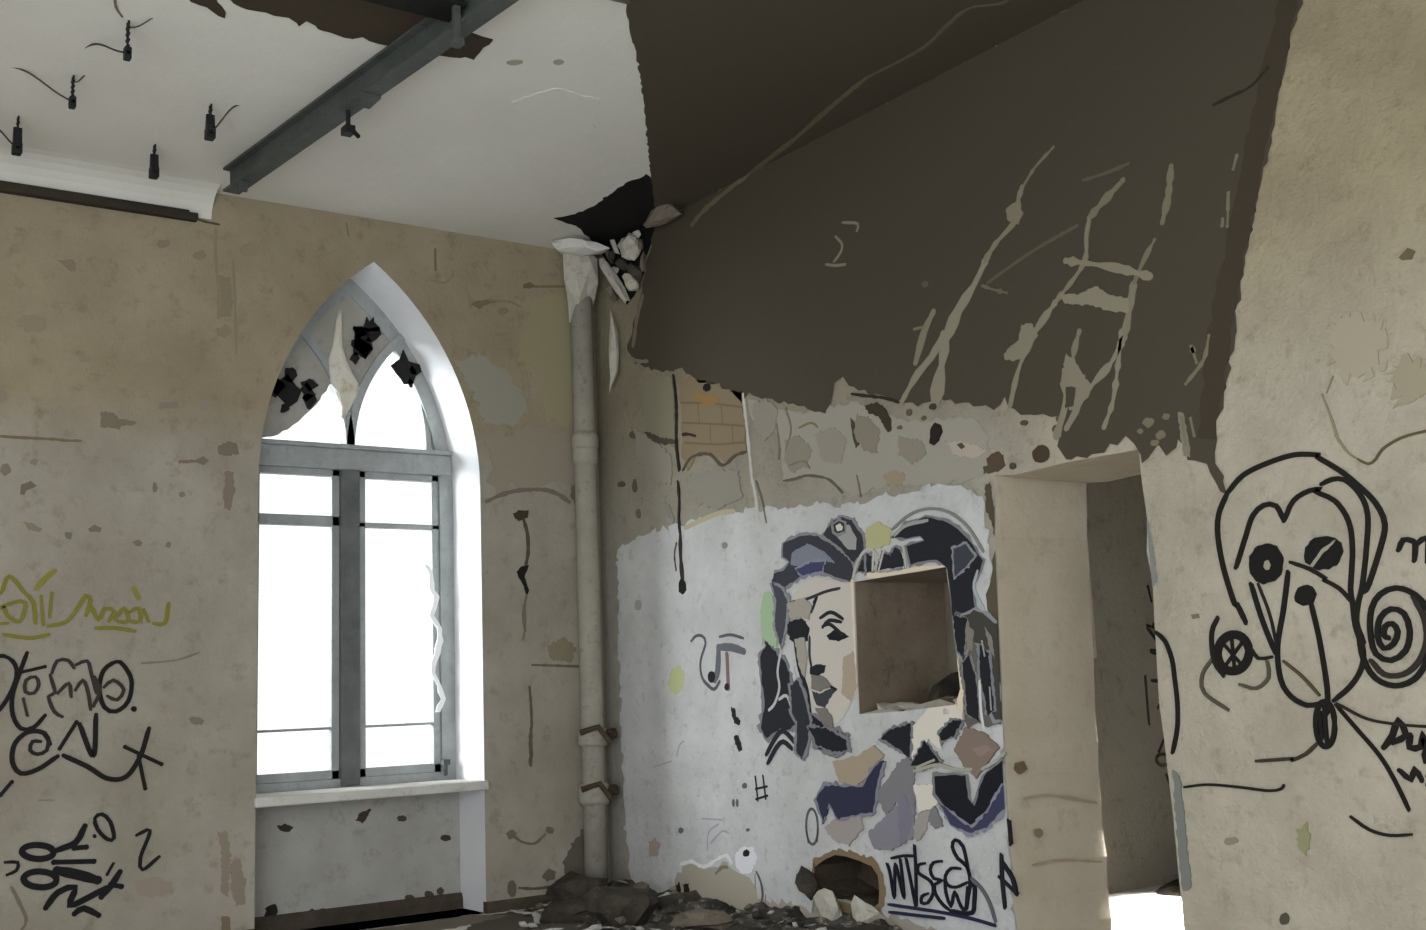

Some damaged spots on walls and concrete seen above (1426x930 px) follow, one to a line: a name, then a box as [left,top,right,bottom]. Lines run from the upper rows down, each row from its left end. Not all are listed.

spalling [552,174,1016,534]
spalling [1032,415,1064,463]
spalling [986,553,1001,683]
spalling [812,848,886,911]